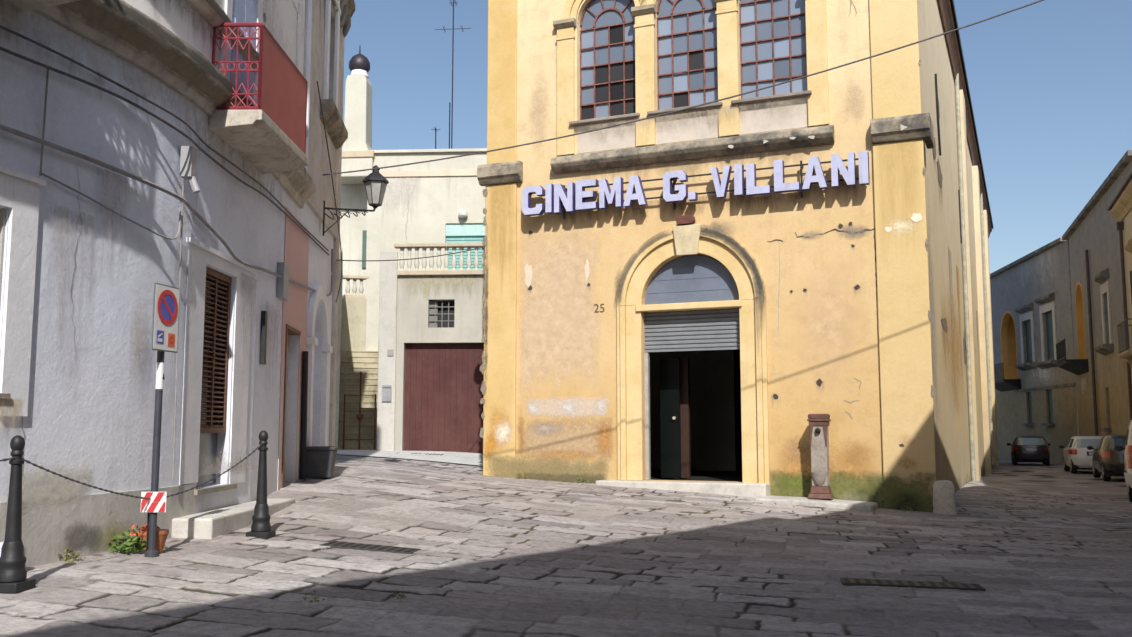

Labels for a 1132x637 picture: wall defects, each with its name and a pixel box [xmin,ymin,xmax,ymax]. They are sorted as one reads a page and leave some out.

peeling [885,213,923,232]
crack [768,228,878,337]
damp [520,419,611,459]
damp [785,446,811,489]
damp [829,453,935,512]